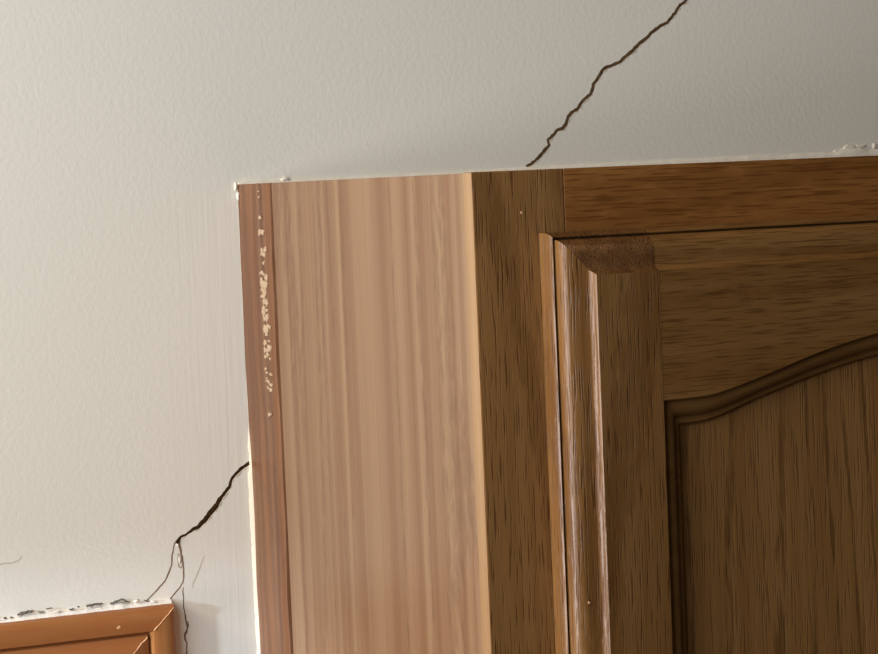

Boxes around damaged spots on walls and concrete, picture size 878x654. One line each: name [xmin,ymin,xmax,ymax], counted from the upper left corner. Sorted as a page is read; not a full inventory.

crack [526,0,689,167]
crack [147,461,249,654]